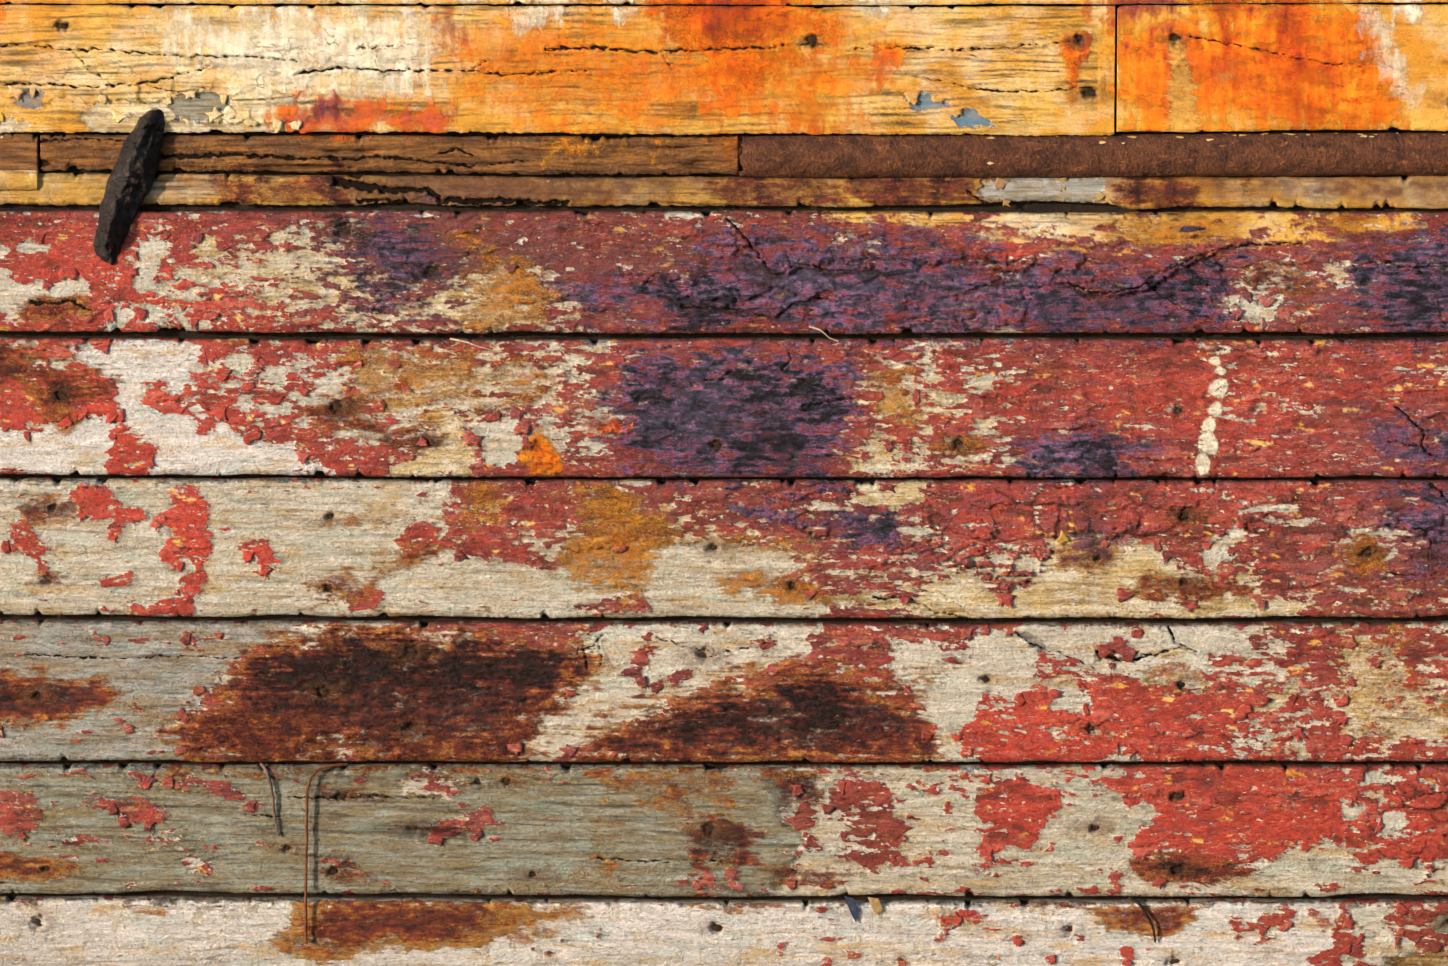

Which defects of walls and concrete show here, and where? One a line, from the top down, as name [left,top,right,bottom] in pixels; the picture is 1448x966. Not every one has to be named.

crack [1,42,1090,93]
corrosion [266,0,906,151]
corrosion [1063,0,1412,132]
corrosion [10,289,94,330]
crack [680,218,867,318]
crack [1068,241,1303,324]
corrosion [0,328,121,435]
crack [802,396,852,408]
peeling [0,231,1448,966]
corrosion [0,663,127,730]
corrosion [156,535,944,914]
corrosion [267,888,591,965]